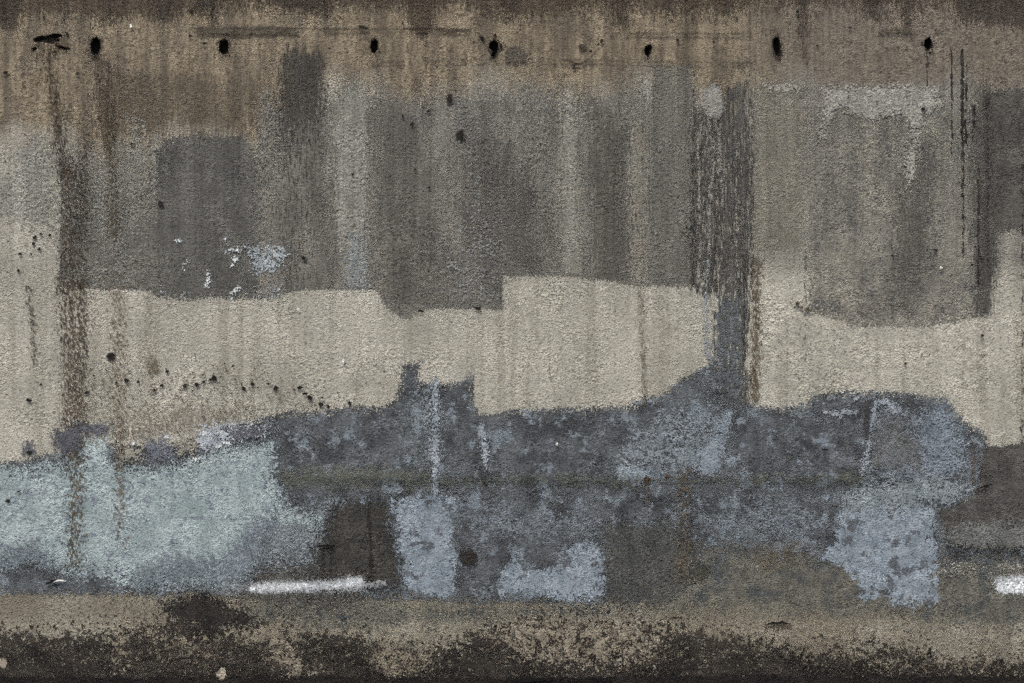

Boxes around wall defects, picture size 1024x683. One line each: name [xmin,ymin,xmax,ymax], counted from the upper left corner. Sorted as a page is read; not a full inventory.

water stain [0,0,1024,64]
rust [25,43,348,573]
water stain [154,164,1024,644]
rust [748,255,765,405]
water stain [0,673,1024,683]